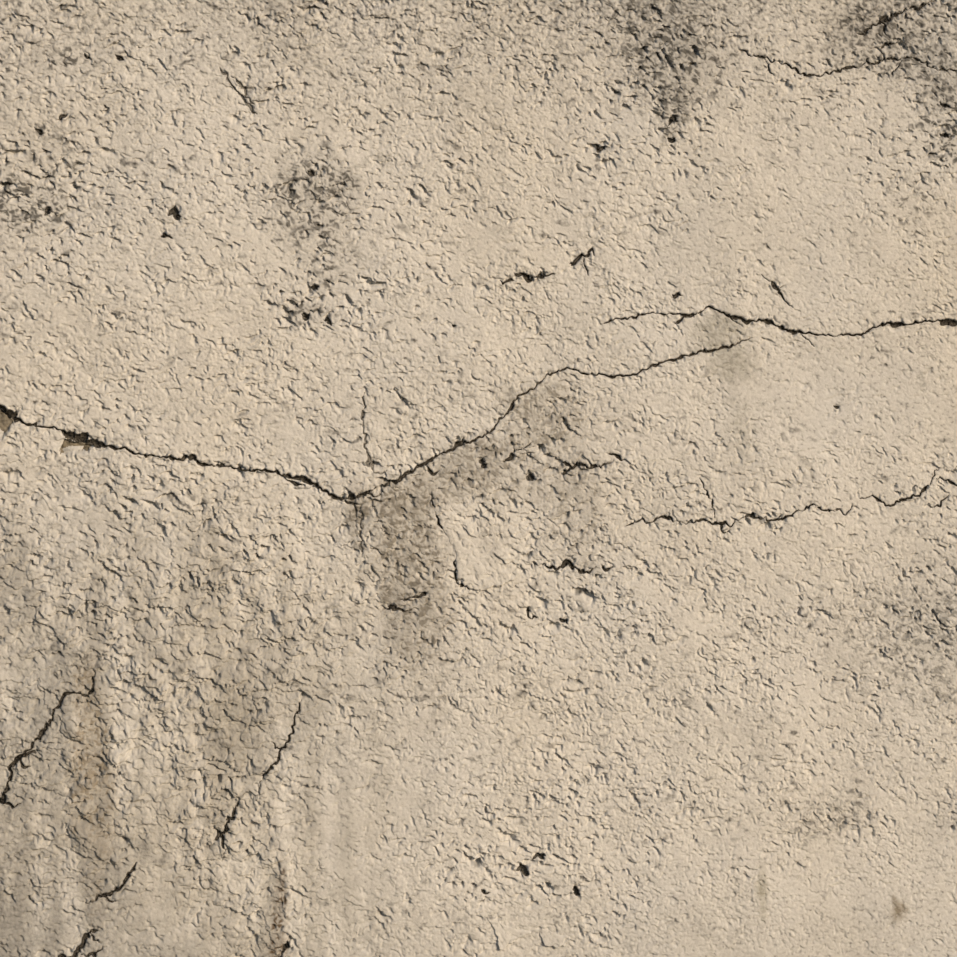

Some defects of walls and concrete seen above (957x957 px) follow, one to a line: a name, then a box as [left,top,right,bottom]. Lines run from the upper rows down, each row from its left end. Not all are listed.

crack [744,2,956,77]
crack [0,274,957,554]
crack [453,560,469,589]
crack [0,671,96,809]
crack [215,699,302,854]